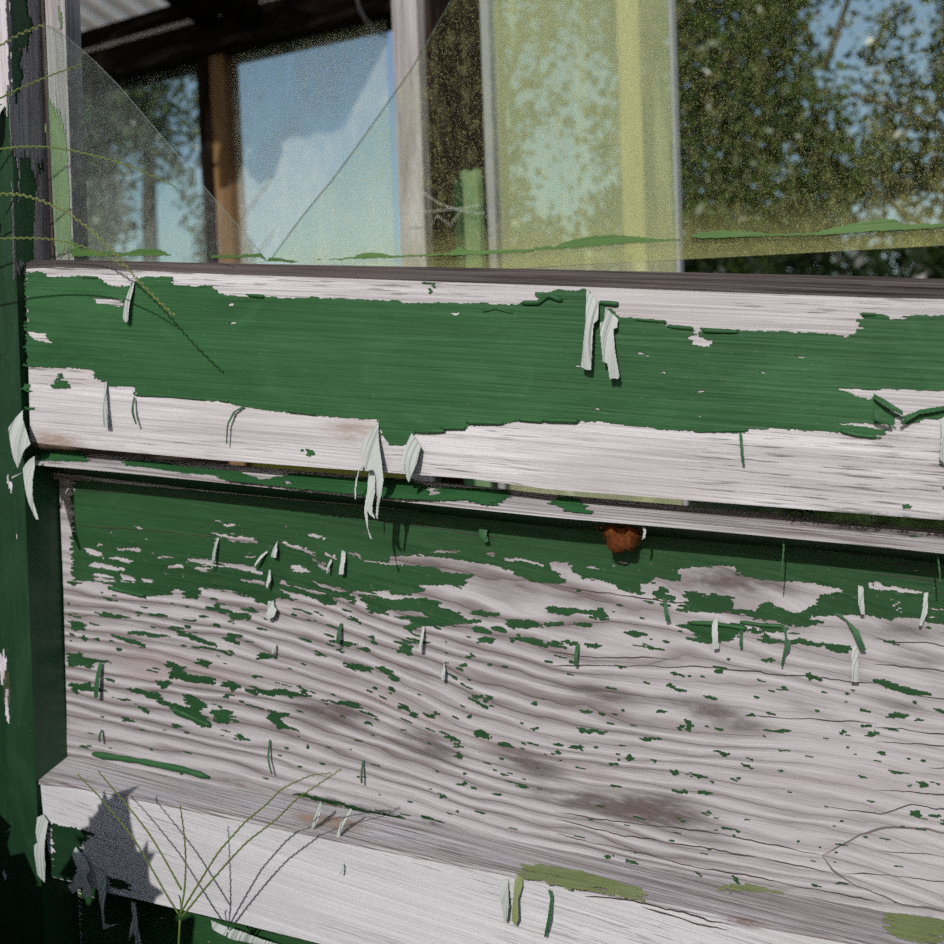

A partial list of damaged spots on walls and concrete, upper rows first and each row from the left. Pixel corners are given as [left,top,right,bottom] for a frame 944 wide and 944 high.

peeling [0,0,944,750]
peeling [397,703,464,759]
peeling [79,732,210,779]
peeling [473,722,599,790]
peeling [670,769,714,795]
peeling [873,751,940,793]
peeling [292,793,459,823]
peeling [900,810,944,831]
peeling [34,814,319,944]
peeling [516,863,647,901]
peeling [717,875,783,894]
peeling [883,902,944,944]